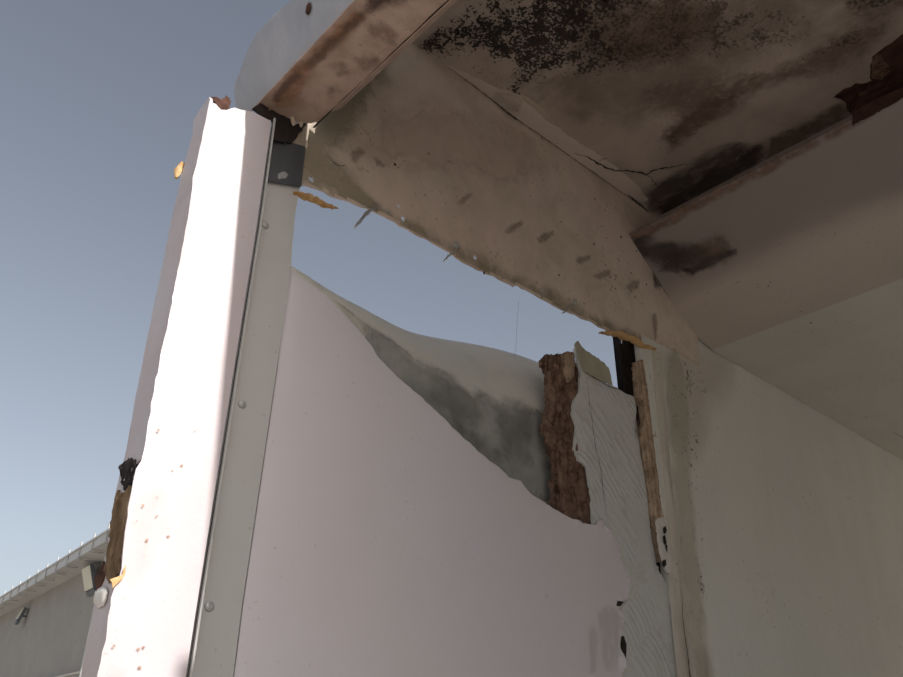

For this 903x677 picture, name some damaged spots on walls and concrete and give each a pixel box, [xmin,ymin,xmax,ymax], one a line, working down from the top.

leakage [418,0,795,94]
crack [313,0,691,212]
peeling [851,87,903,125]
leakage [648,105,847,213]
leakage [632,236,735,287]
peeling [574,341,613,386]
leakage [366,326,552,502]
peeling [93,457,138,608]
peeling [655,517,671,574]